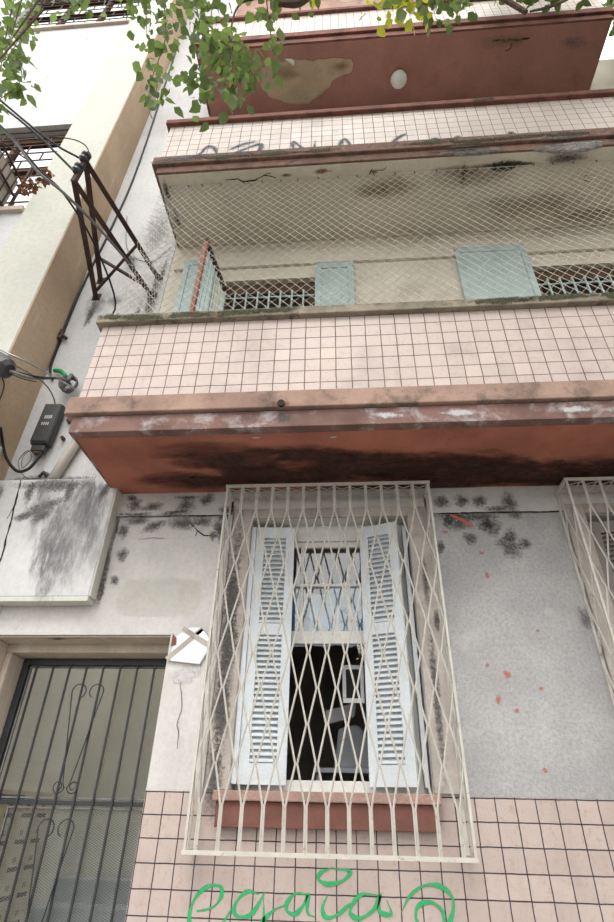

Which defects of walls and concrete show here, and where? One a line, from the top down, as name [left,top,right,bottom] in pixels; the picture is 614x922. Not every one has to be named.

peeling [259,57,355,105]
crack [492,37,530,51]
crack [227,173,276,186]
crack [0,480,21,561]
leakage [15,476,109,543]
leakage [113,446,614,555]
leakage [206,527,241,802]
leakage [429,640,444,757]